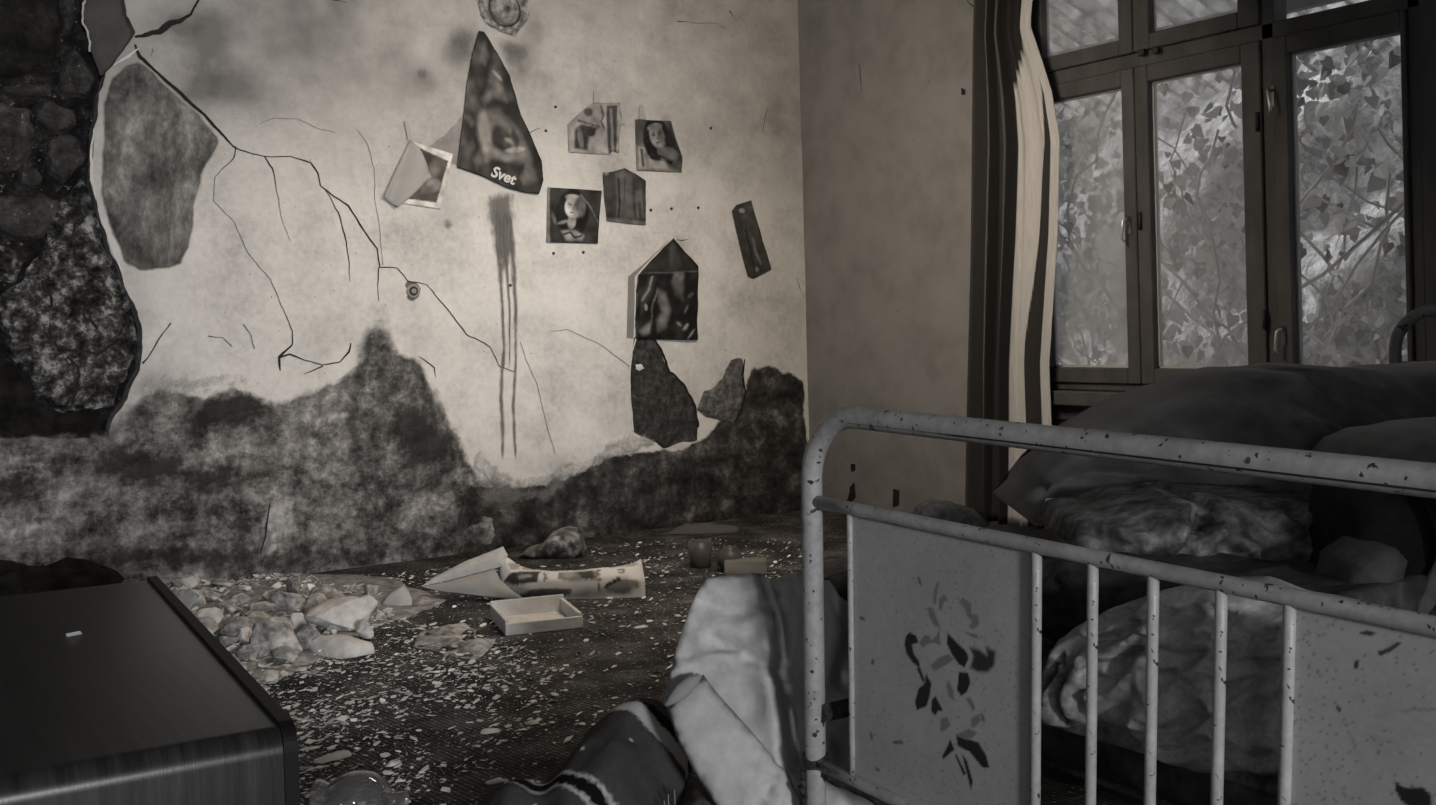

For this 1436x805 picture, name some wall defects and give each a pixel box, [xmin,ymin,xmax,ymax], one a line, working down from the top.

flaking render [0,0,218,439]
crack [134,0,555,453]
water stain [490,196,517,455]
spalling [475,337,746,489]